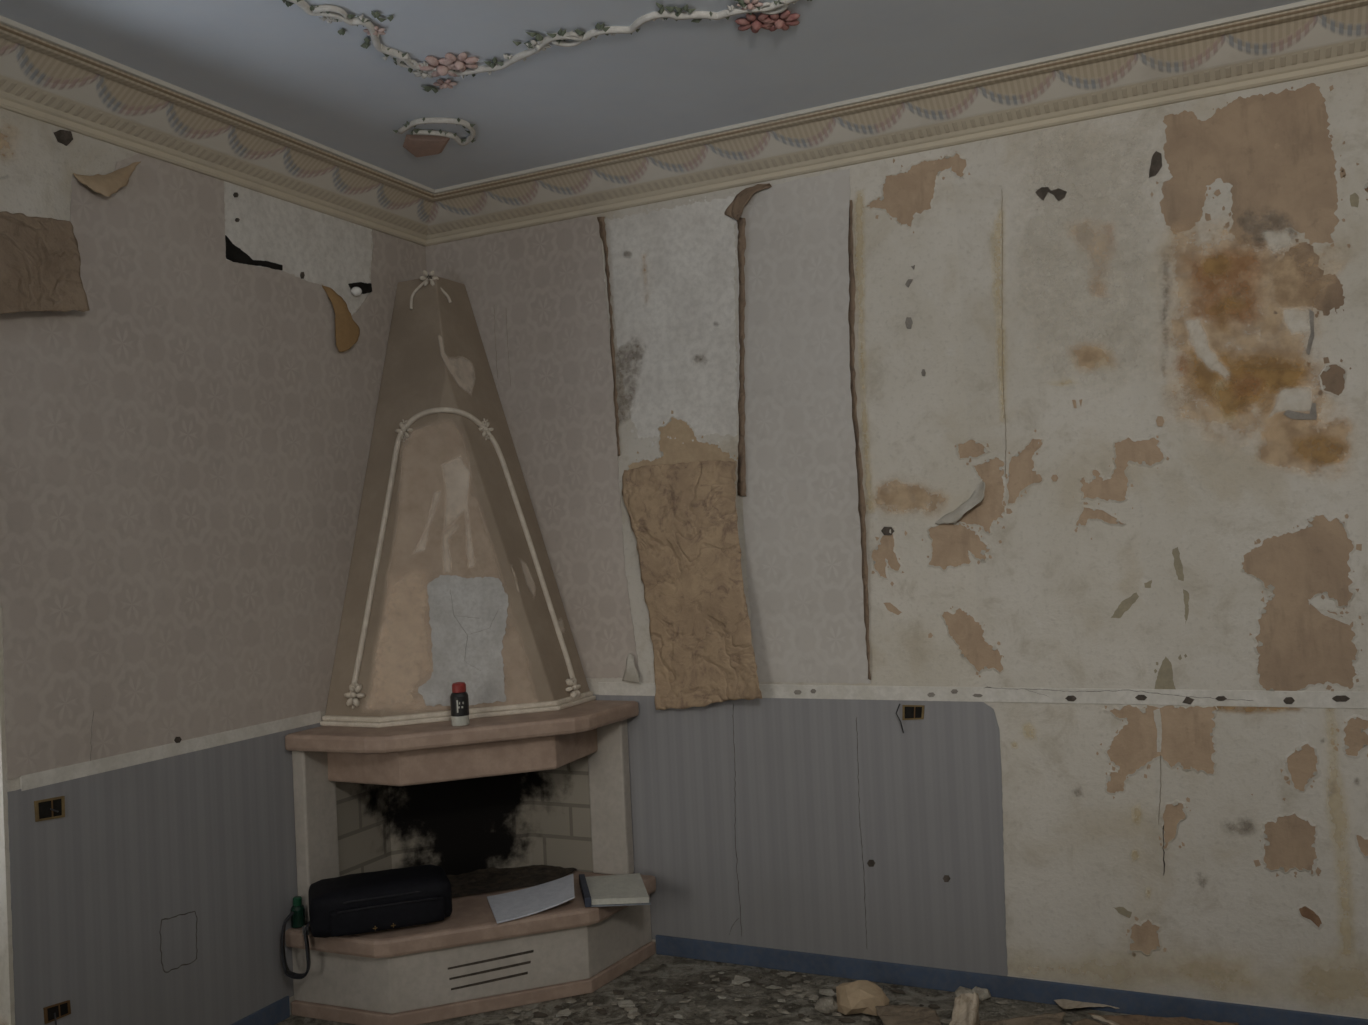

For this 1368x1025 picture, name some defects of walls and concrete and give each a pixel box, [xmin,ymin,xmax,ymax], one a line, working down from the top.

peeling [224,181,372,315]
peeling [863,151,971,233]
peeling [1149,83,1368,420]
damp [1165,215,1348,471]
peeling [870,429,1045,615]
peeling [928,606,1005,677]
peeling [1096,654,1220,799]
peeling [1240,514,1364,693]